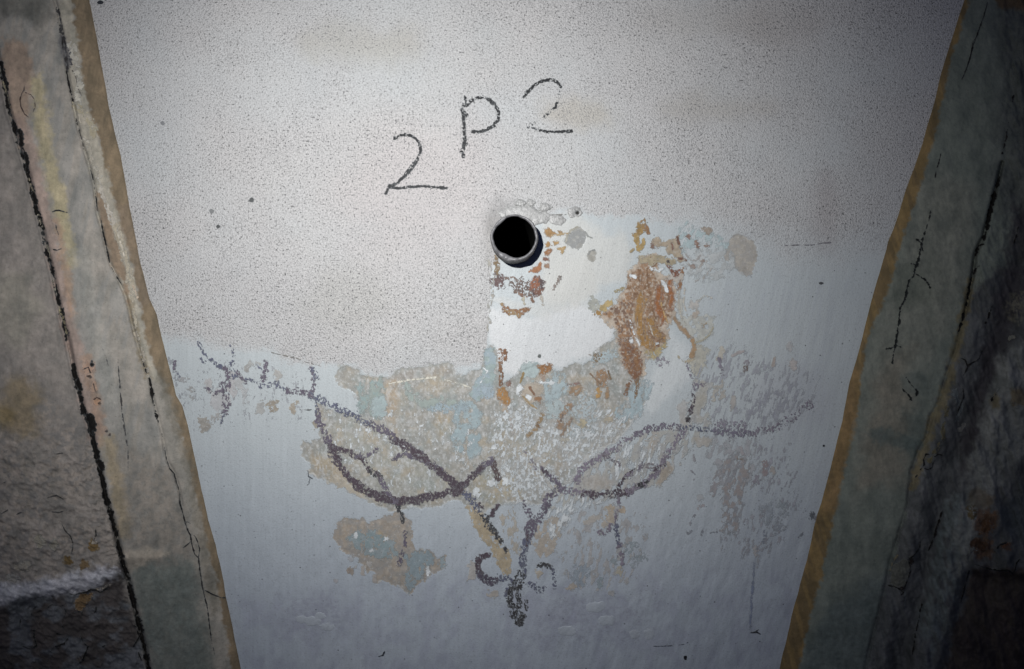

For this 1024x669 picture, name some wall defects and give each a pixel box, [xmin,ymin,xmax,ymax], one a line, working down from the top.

crack [962,2,988,79]
crack [0,61,226,669]
corrosion [486,227,569,331]
peeling [564,226,597,262]
corrosion [588,218,687,399]
peeling [724,233,758,277]
crack [886,211,931,401]
crack [958,95,1015,332]
peeling [168,329,816,596]
crack [888,510,943,655]